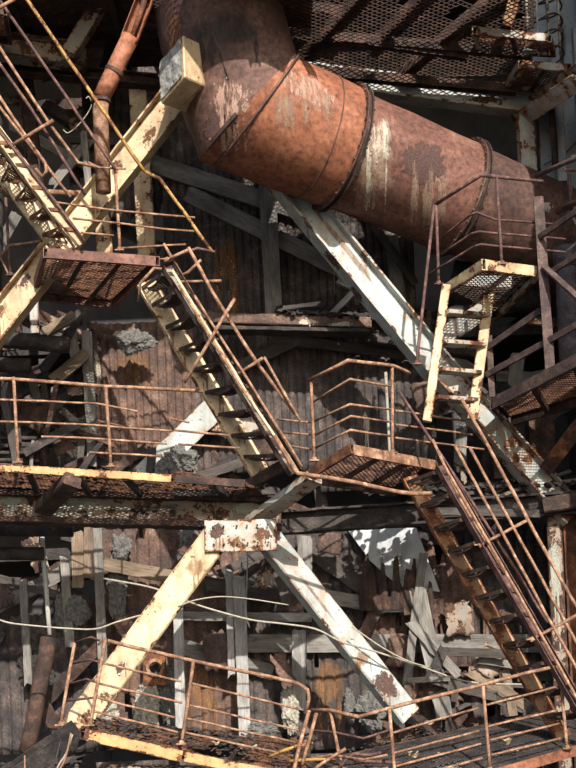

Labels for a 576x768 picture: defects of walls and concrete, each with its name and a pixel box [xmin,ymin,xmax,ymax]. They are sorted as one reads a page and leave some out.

corrosion [398,141,449,226]
corrosion [352,250,371,280]
corrosion [253,524,273,550]